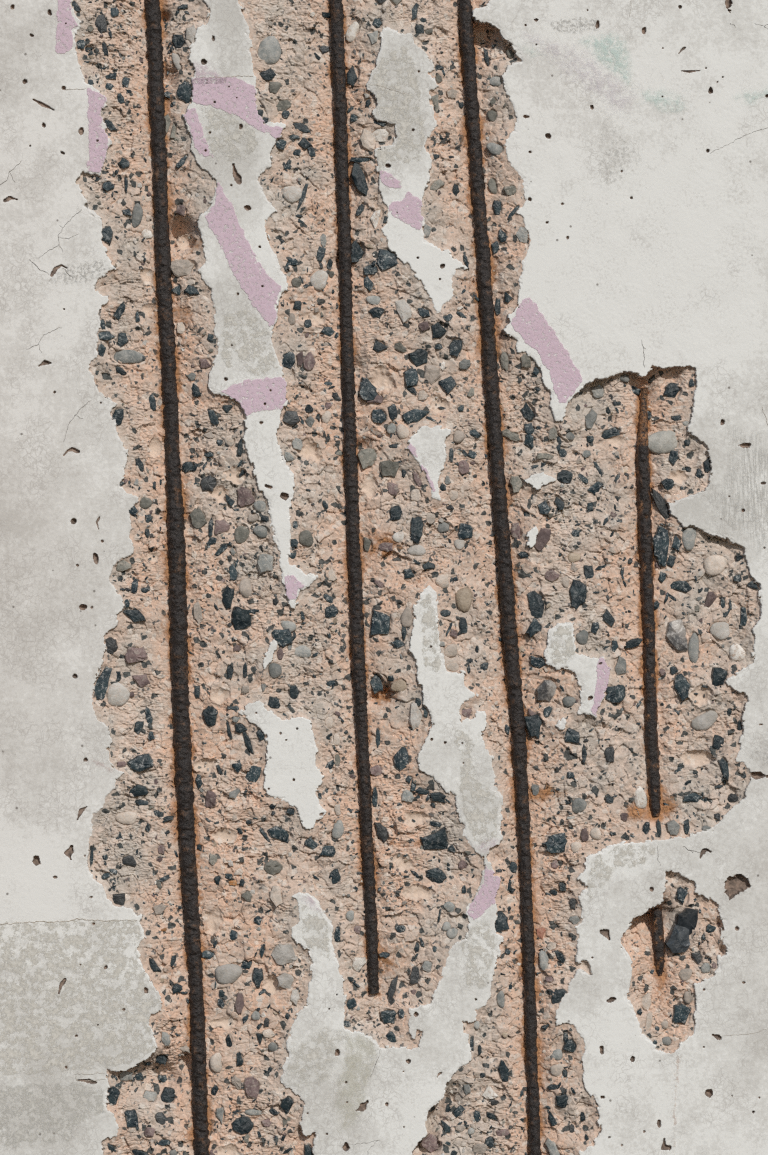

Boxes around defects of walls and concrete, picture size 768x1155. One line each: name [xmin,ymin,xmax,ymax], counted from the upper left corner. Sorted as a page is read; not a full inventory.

corrosion [458,18,479,88]
corrosion [152,183,173,222]
corrosion [332,108,353,262]
corrosion [153,249,190,443]
corrosion [471,231,500,368]
spalling [0,0,530,1155]
corrosion [343,533,401,613]
corrosion [349,629,395,705]
corrosion [495,549,553,822]
spalling [459,0,762,1155]
corrosion [636,524,659,714]
corrosion [517,838,545,1155]